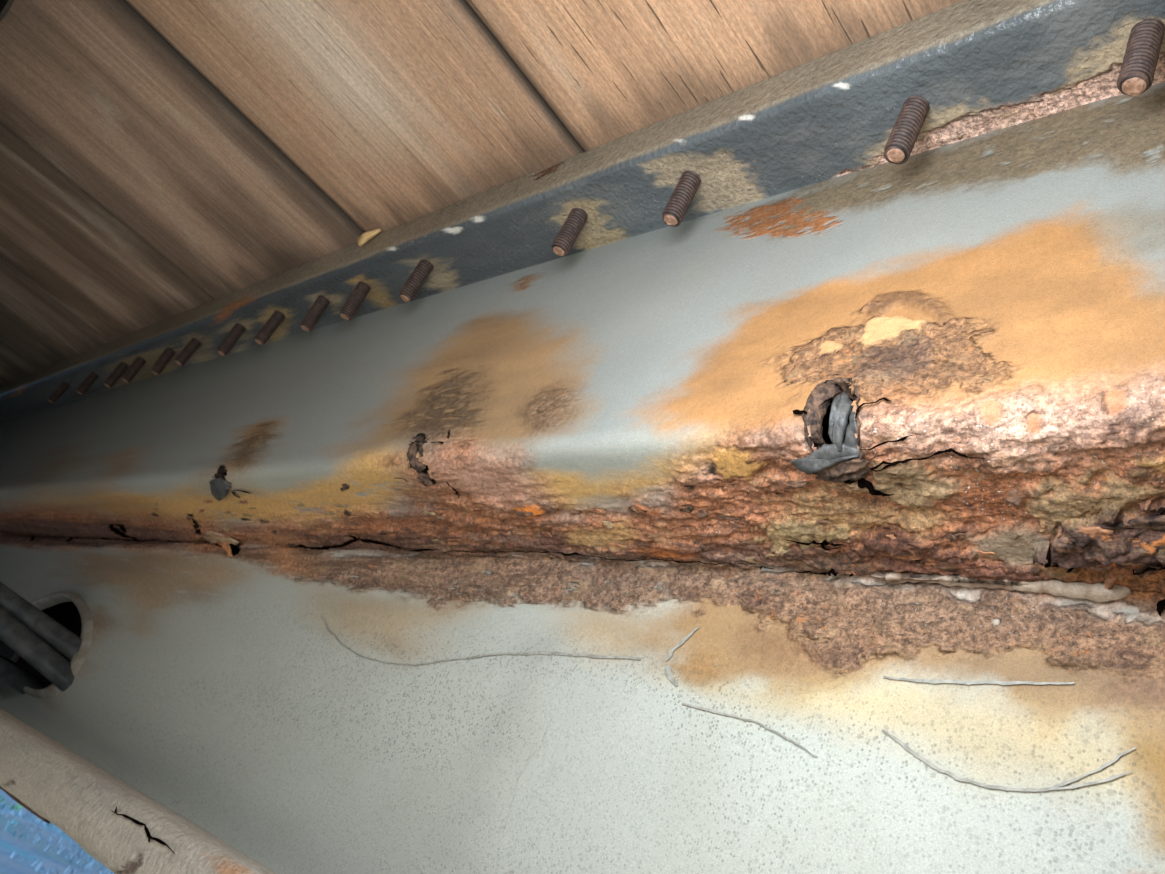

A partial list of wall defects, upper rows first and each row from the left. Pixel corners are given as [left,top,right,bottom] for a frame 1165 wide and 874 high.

peeling [862,315,928,342]
corrosion [0,82,1165,717]
crack [855,397,892,419]
peeling [228,451,348,494]
peeling [523,416,699,476]
peeling [682,446,762,496]
crack [844,435,985,496]
peeling [751,464,958,556]
peeling [964,474,1158,566]
crack [1045,540,1074,573]
crack [1157,599,1165,616]
crack [111,806,175,854]